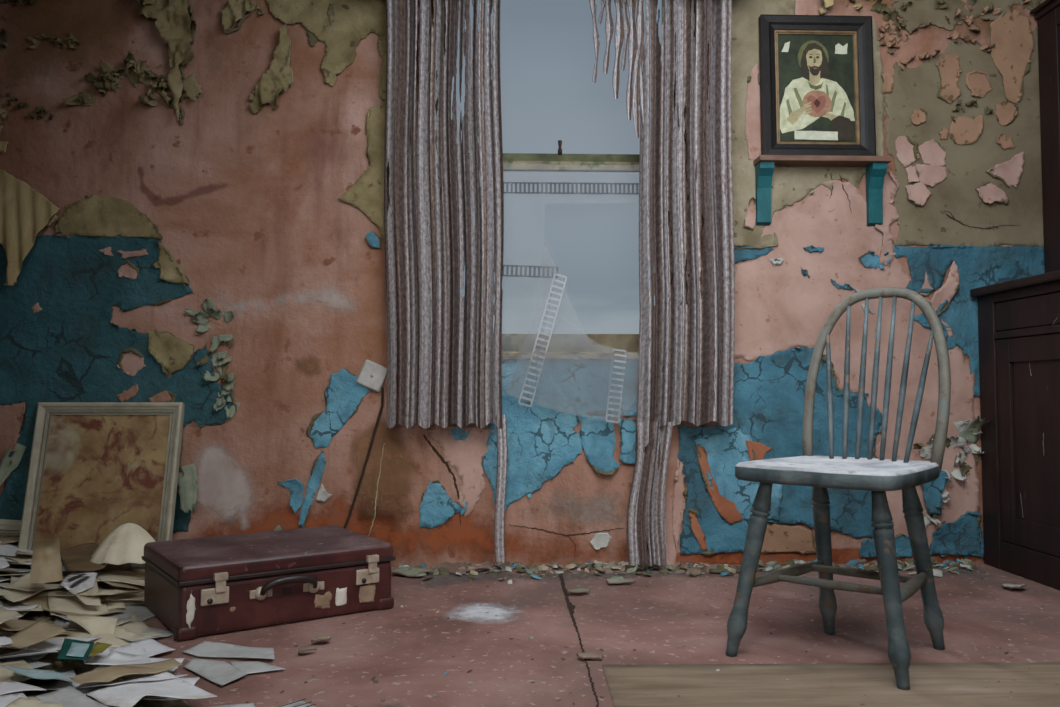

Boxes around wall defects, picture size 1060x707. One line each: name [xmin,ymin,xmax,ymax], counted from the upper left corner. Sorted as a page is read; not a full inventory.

peeling [63,10,196,107]
peeling [220,0,389,249]
peeling [0,195,240,533]
peeling [277,368,370,528]
crack [423,435,461,525]
leakage [196,422,707,585]
peeling [419,360,638,529]
crack [509,524,624,707]
peeling [590,532,612,550]
peeling [672,0,1045,562]